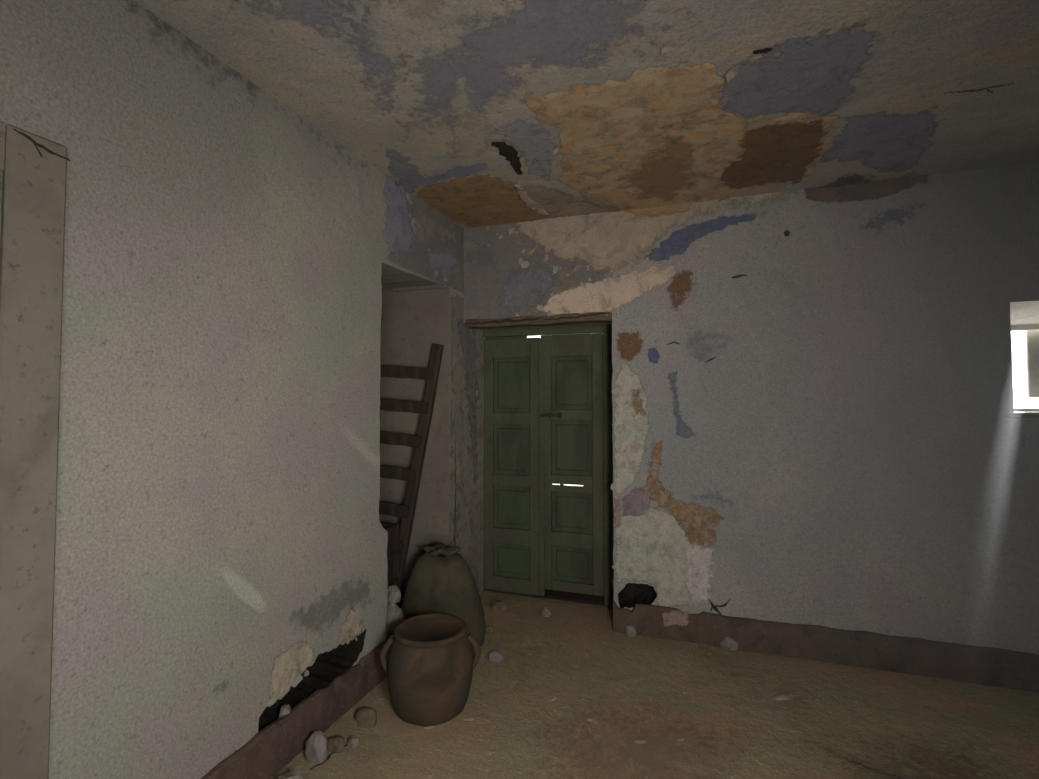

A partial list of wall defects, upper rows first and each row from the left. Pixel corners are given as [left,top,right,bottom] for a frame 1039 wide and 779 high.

flaking render [376,60,840,316]
peeling [648,348,660,363]
flaking render [611,361,695,627]
spalling [258,604,366,732]